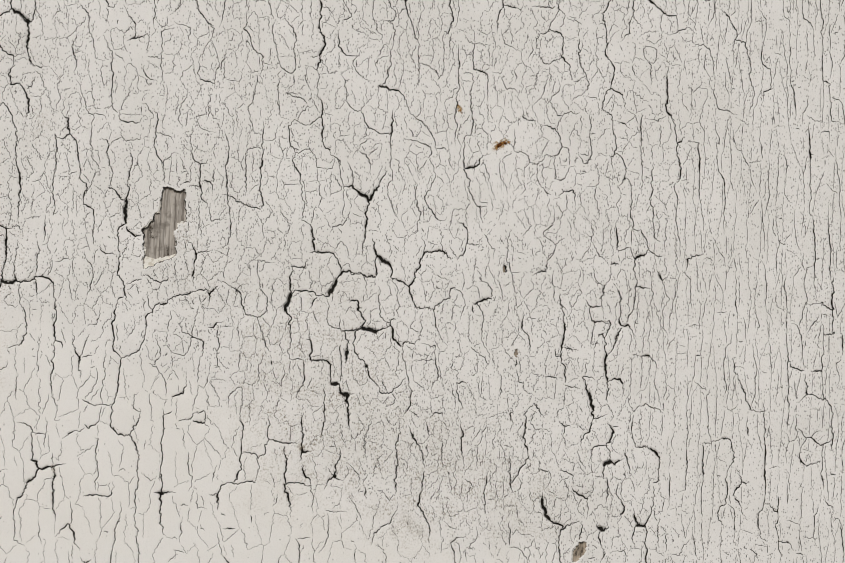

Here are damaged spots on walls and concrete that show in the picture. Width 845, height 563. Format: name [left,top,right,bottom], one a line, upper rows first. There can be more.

peeling [141,187,187,269]
crack [191,517,265,563]
crack [433,464,518,563]
crack [483,517,540,563]
peeling [572,542,587,562]
crack [665,510,696,563]
crack [805,502,829,563]